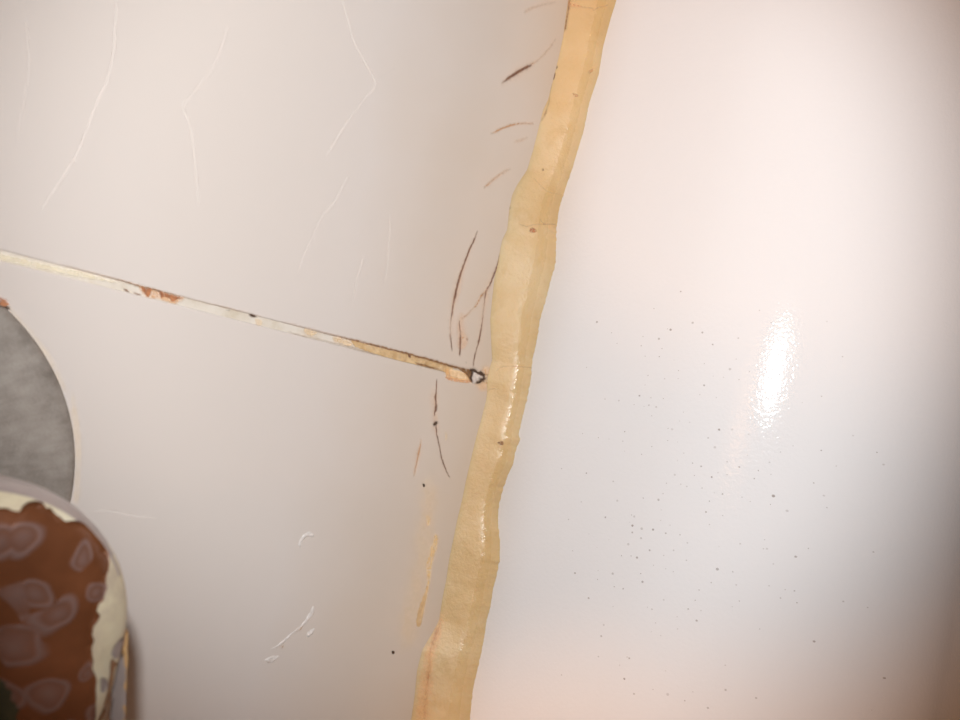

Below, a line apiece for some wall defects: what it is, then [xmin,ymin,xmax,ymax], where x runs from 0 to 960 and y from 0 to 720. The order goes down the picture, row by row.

crack [505,65,531,81]
corrosion [124,287,180,302]
crack [342,238,498,476]
peeling [98,628,128,720]